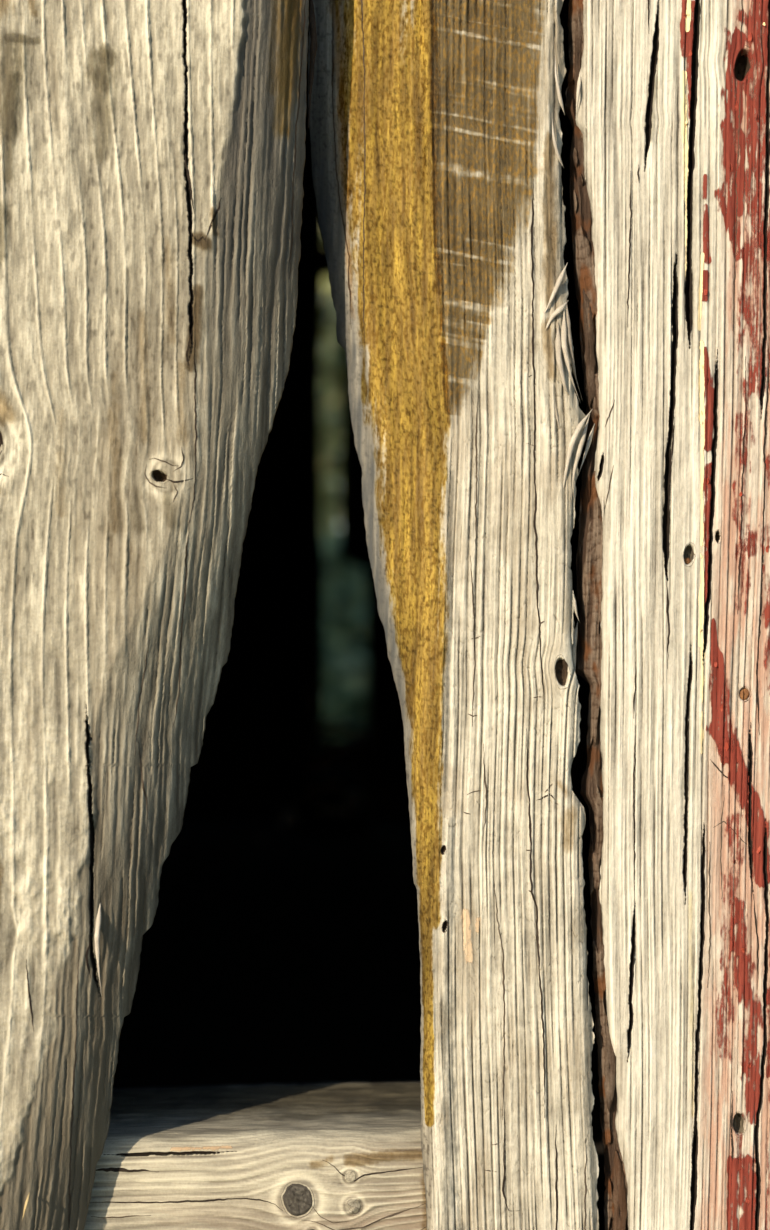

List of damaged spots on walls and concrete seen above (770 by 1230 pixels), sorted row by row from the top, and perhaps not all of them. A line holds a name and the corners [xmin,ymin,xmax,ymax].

crack [135,640,150,819]
crack [144,0,222,725]
crack [68,706,426,1230]
crack [485,882,522,1230]
crack [526,729,587,1230]
crack [598,456,614,507]
crack [627,662,636,1062]
crack [627,0,659,327]
crack [663,0,770,1230]
peeling [680,0,770,1230]